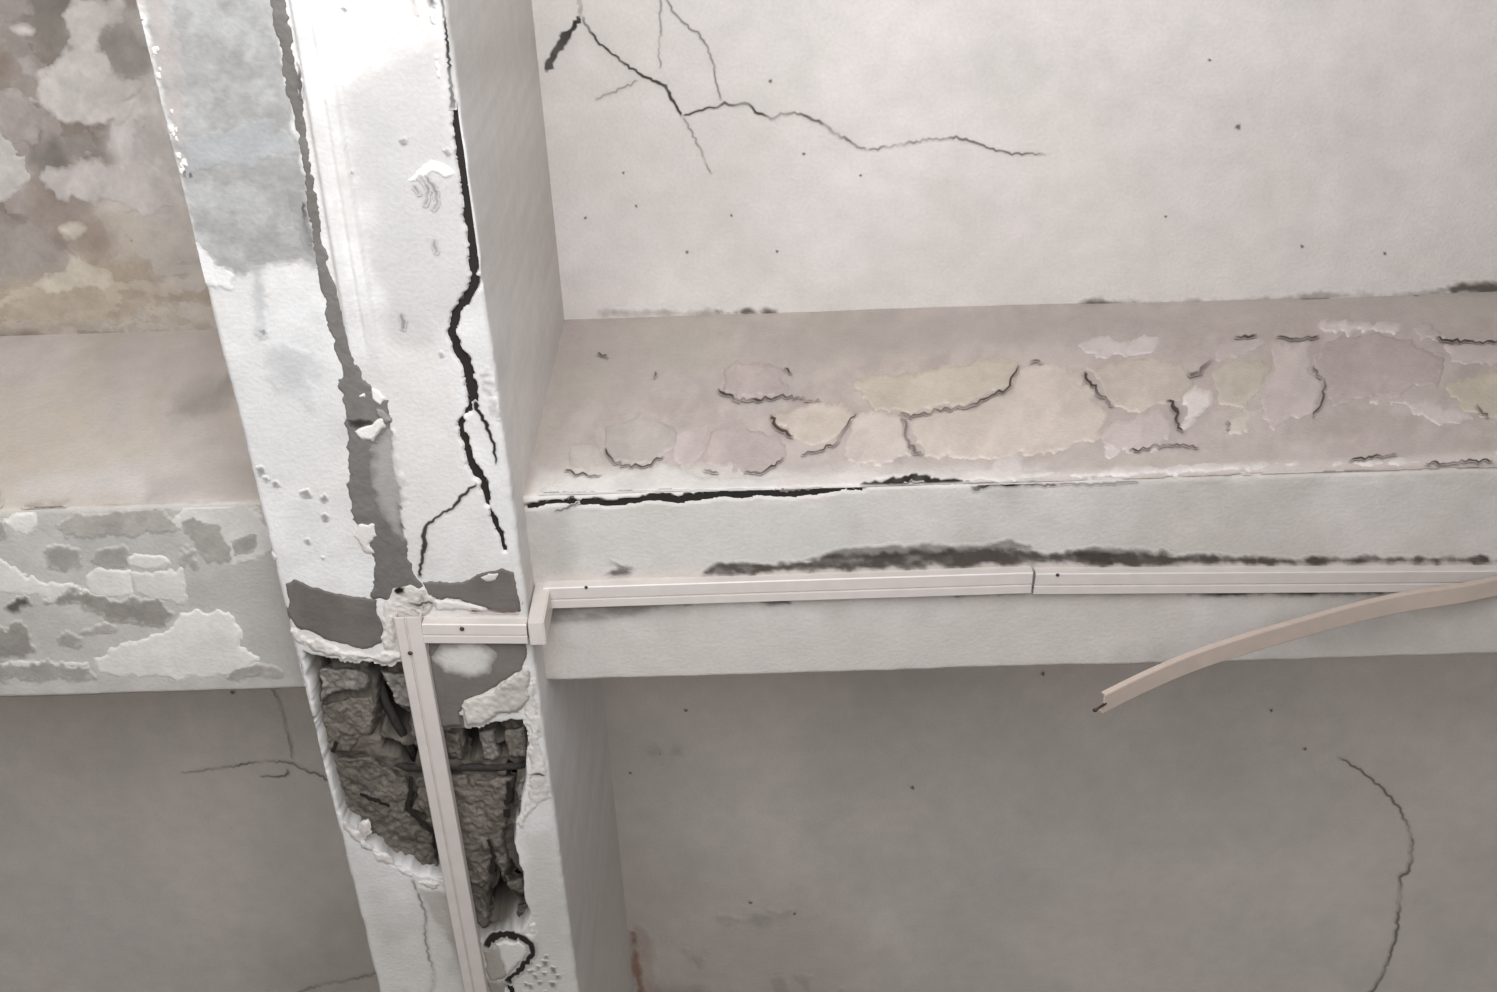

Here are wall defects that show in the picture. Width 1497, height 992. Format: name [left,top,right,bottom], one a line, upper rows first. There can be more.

peeling [0,0,329,295]
crack [407,0,1138,610]
peeling [538,295,1497,495]
peeling [0,505,285,685]
damp [550,604,694,625]
damp [758,601,795,609]
damp [700,535,1497,577]
damp [1182,592,1399,601]
crack [180,636,328,782]
spalling [290,626,444,890]
crack [482,929,536,992]
crack [1338,756,1415,992]